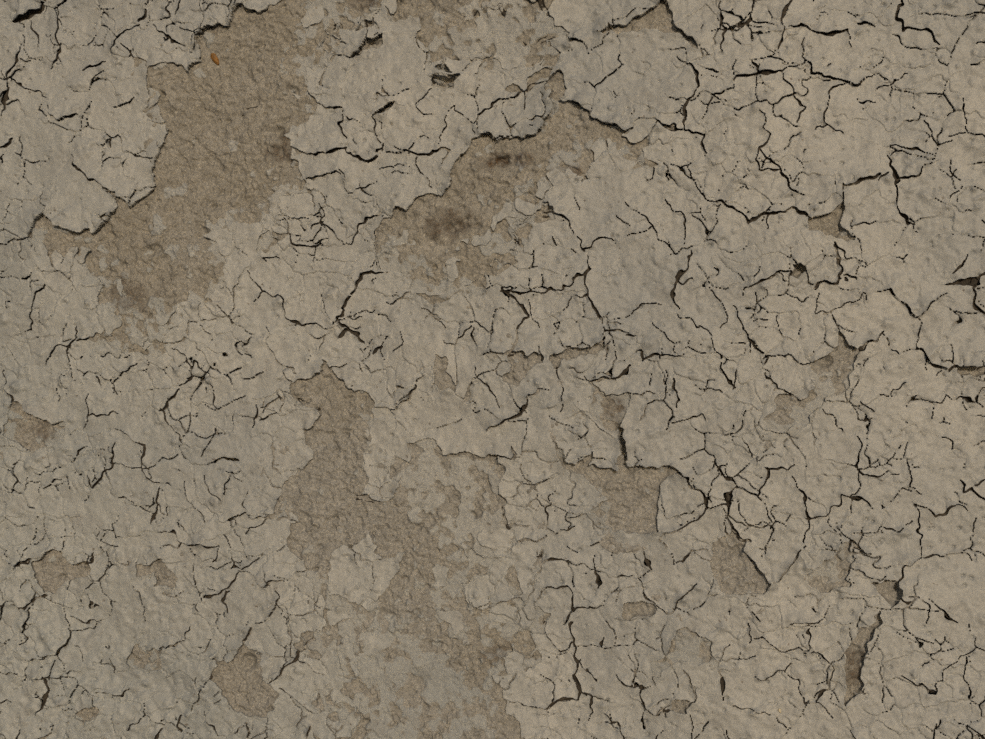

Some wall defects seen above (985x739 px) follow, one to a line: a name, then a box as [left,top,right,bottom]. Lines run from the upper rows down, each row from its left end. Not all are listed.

crack [0,0,204,198]
peeling [12,0,719,357]
crack [20,269,51,339]
crack [39,0,612,656]
crack [379,0,985,739]
crack [8,459,23,496]
peeling [20,536,109,606]
crack [0,546,274,739]
peeling [203,631,295,734]
crack [268,624,325,739]
peeling [256,315,710,739]
peeling [606,582,734,724]